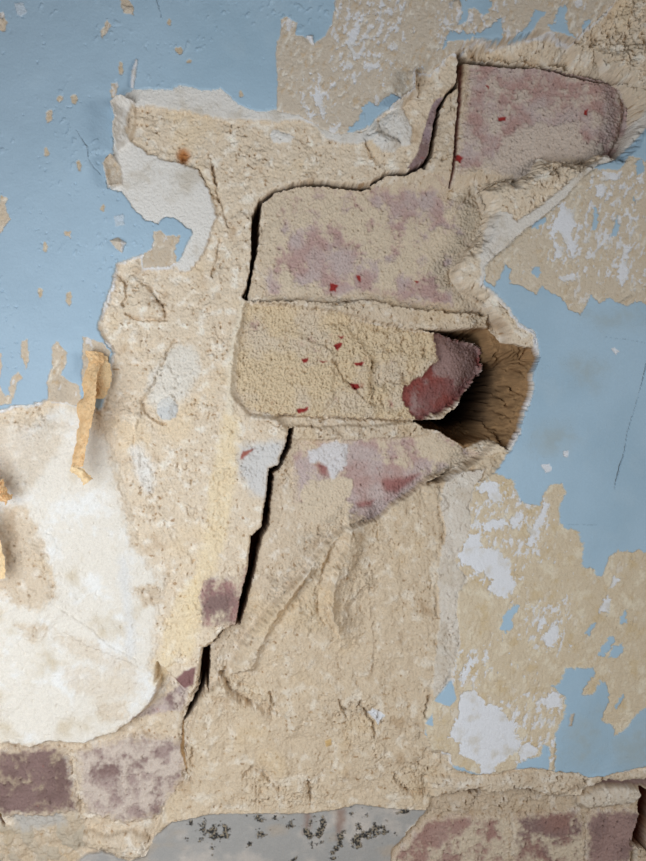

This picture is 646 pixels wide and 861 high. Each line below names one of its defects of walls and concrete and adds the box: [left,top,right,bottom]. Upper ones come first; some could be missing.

peeling [103,0,646,272]
crack [242,57,628,303]
flaking render [0,54,461,861]
crack [181,428,294,774]
spalling [155,64,646,861]
crack [614,365,646,489]